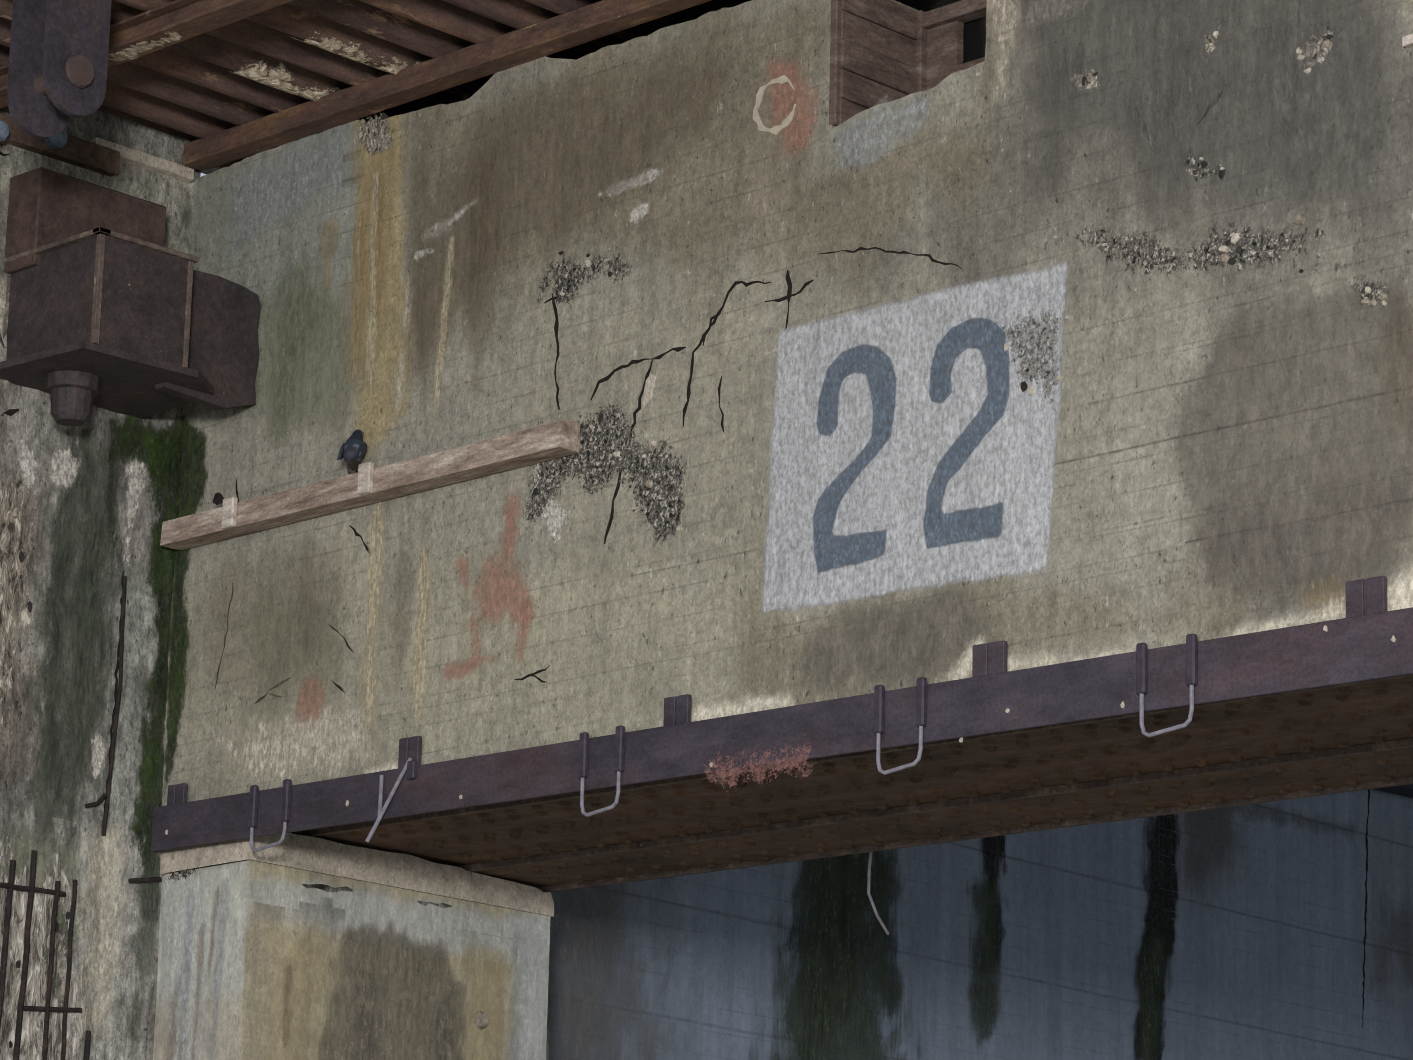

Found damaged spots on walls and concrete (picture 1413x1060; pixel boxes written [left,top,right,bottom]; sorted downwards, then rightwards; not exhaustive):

water stain [993,0,1017,82]
spalling [523,401,687,547]
crack [544,247,962,544]
spalling [0,471,39,731]
water stain [1229,597,1346,636]
spalling [85,576,127,836]
spalling [0,836,94,1060]
water stain [319,898,514,1060]
water stain [795,853,902,1060]
water stain [969,874,1000,1039]
water stain [1135,938,1166,1060]